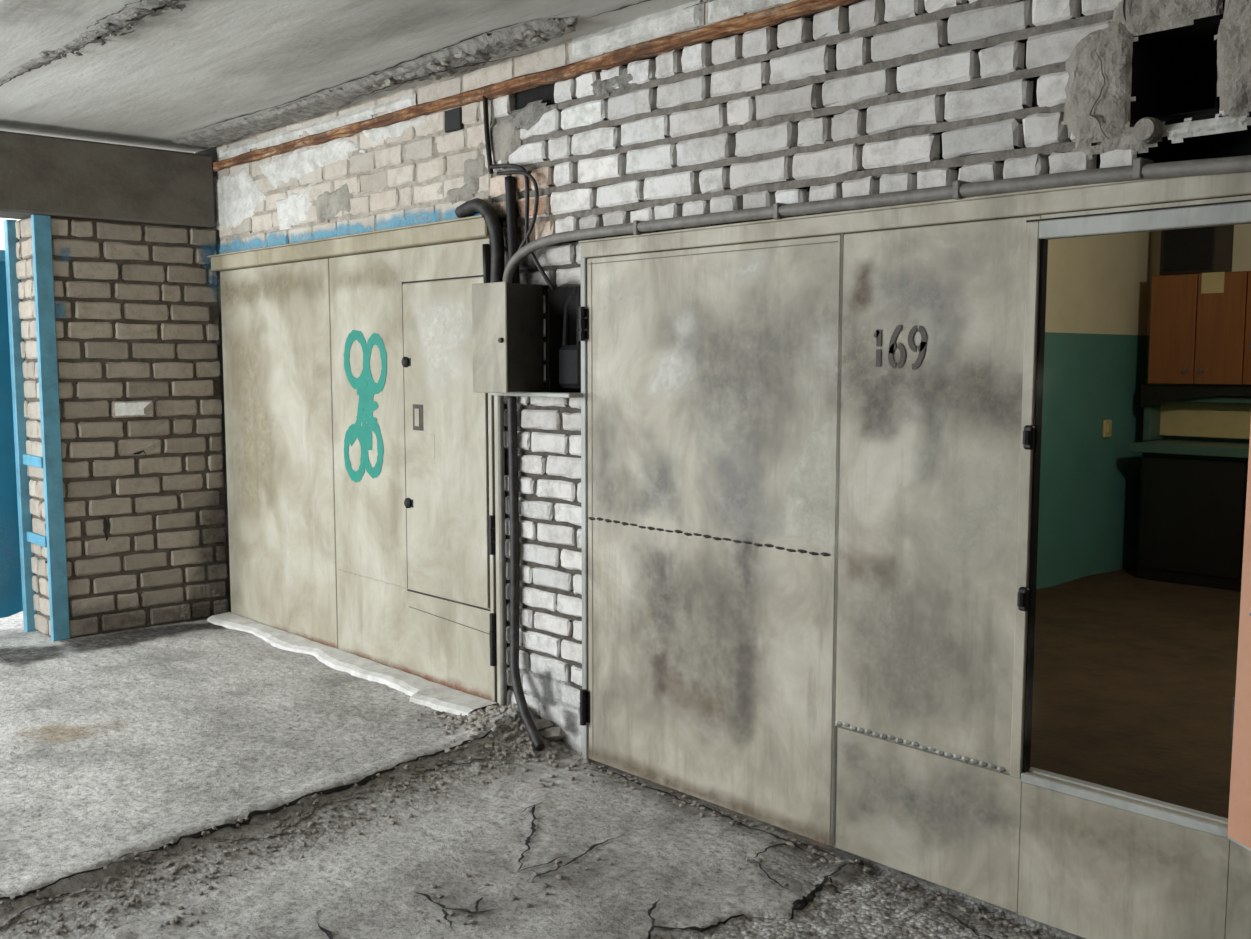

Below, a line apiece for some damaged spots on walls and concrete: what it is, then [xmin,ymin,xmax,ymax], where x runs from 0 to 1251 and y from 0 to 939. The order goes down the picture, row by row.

flaking render [170,0,796,231]
crack [517,802,622,879]
crack [589,764,855,939]